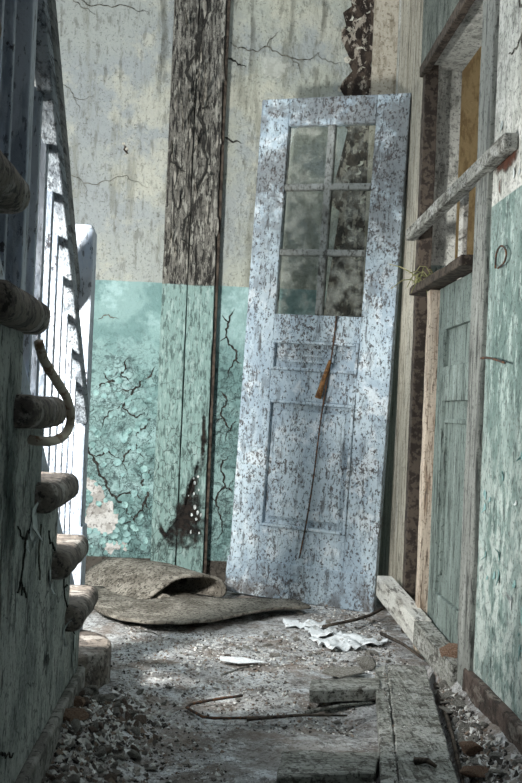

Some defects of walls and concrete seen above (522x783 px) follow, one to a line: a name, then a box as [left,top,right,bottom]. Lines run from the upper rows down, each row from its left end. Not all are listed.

crack [73,0,145,12]
crack [228,32,341,74]
flaking render [338,0,374,96]
flaking render [324,126,369,317]
peeling [85,370,150,555]
crack [88,360,154,539]
damp [159,404,206,550]
crack [211,312,242,540]
crack [17,518,56,598]
crack [61,579,69,608]
crack [0,751,14,759]